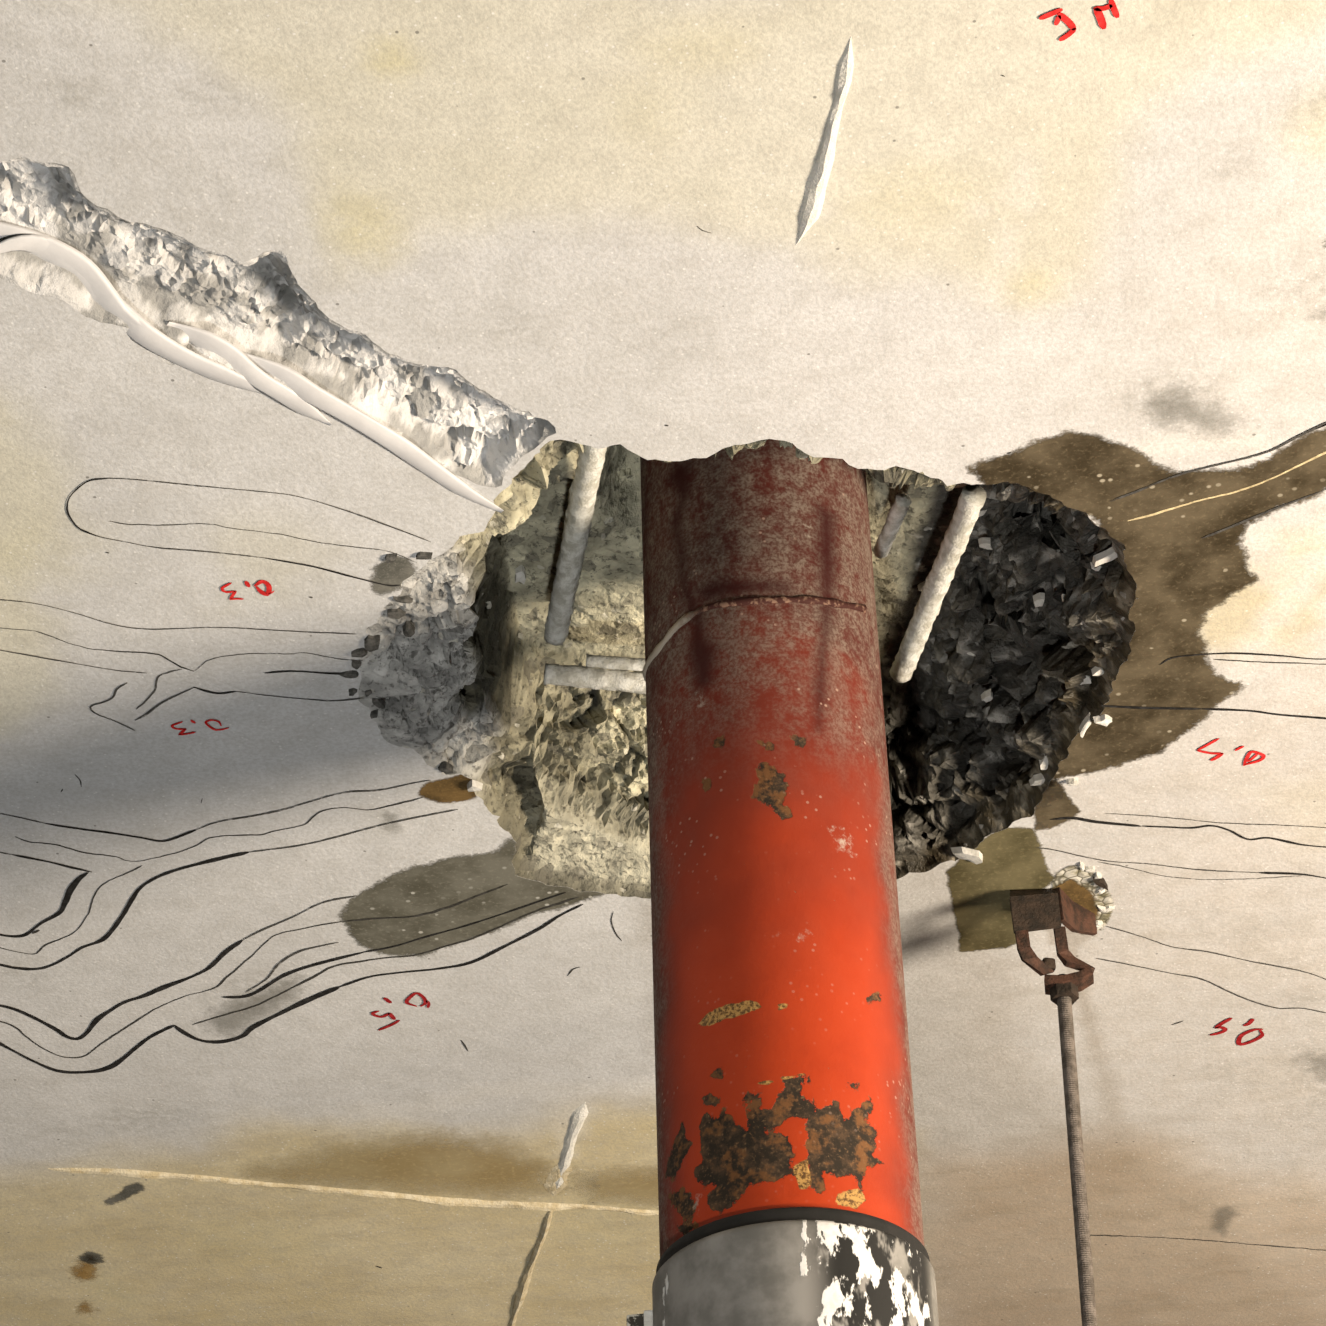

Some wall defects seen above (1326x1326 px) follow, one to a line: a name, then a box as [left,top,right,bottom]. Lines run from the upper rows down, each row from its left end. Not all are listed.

spalling [714,439,823,464]
spalling [0,156,671,899]
spalling [863,466,1137,879]
damp [946,429,1326,952]
rust [419,774,476,803]
damp [339,839,603,956]
damp [281,1142,536,1188]
damp [590,1175,658,1199]